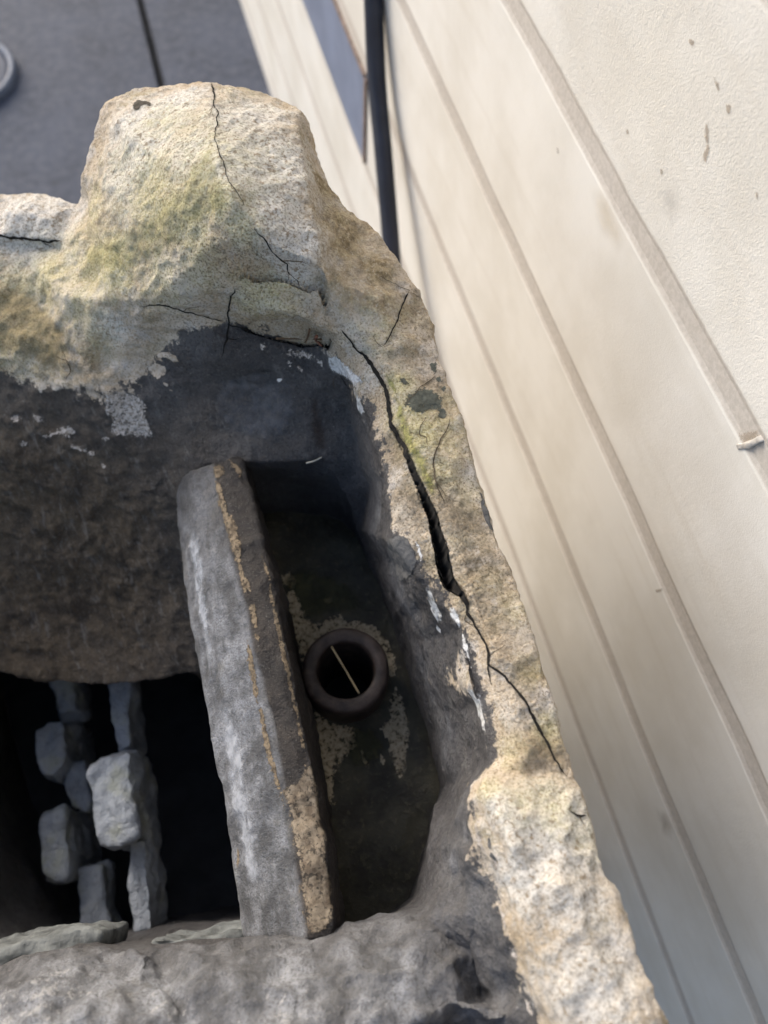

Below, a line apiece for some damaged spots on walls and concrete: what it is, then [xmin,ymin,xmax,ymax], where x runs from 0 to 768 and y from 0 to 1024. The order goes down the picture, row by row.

crack [210,83,244,204]
crack [0,234,60,246]
crack [254,229,306,285]
crack [144,290,239,356]
peeling [145,352,179,391]
peeling [287,349,324,372]
peeling [11,414,106,468]
peeling [102,391,152,441]
crack [342,276,567,776]